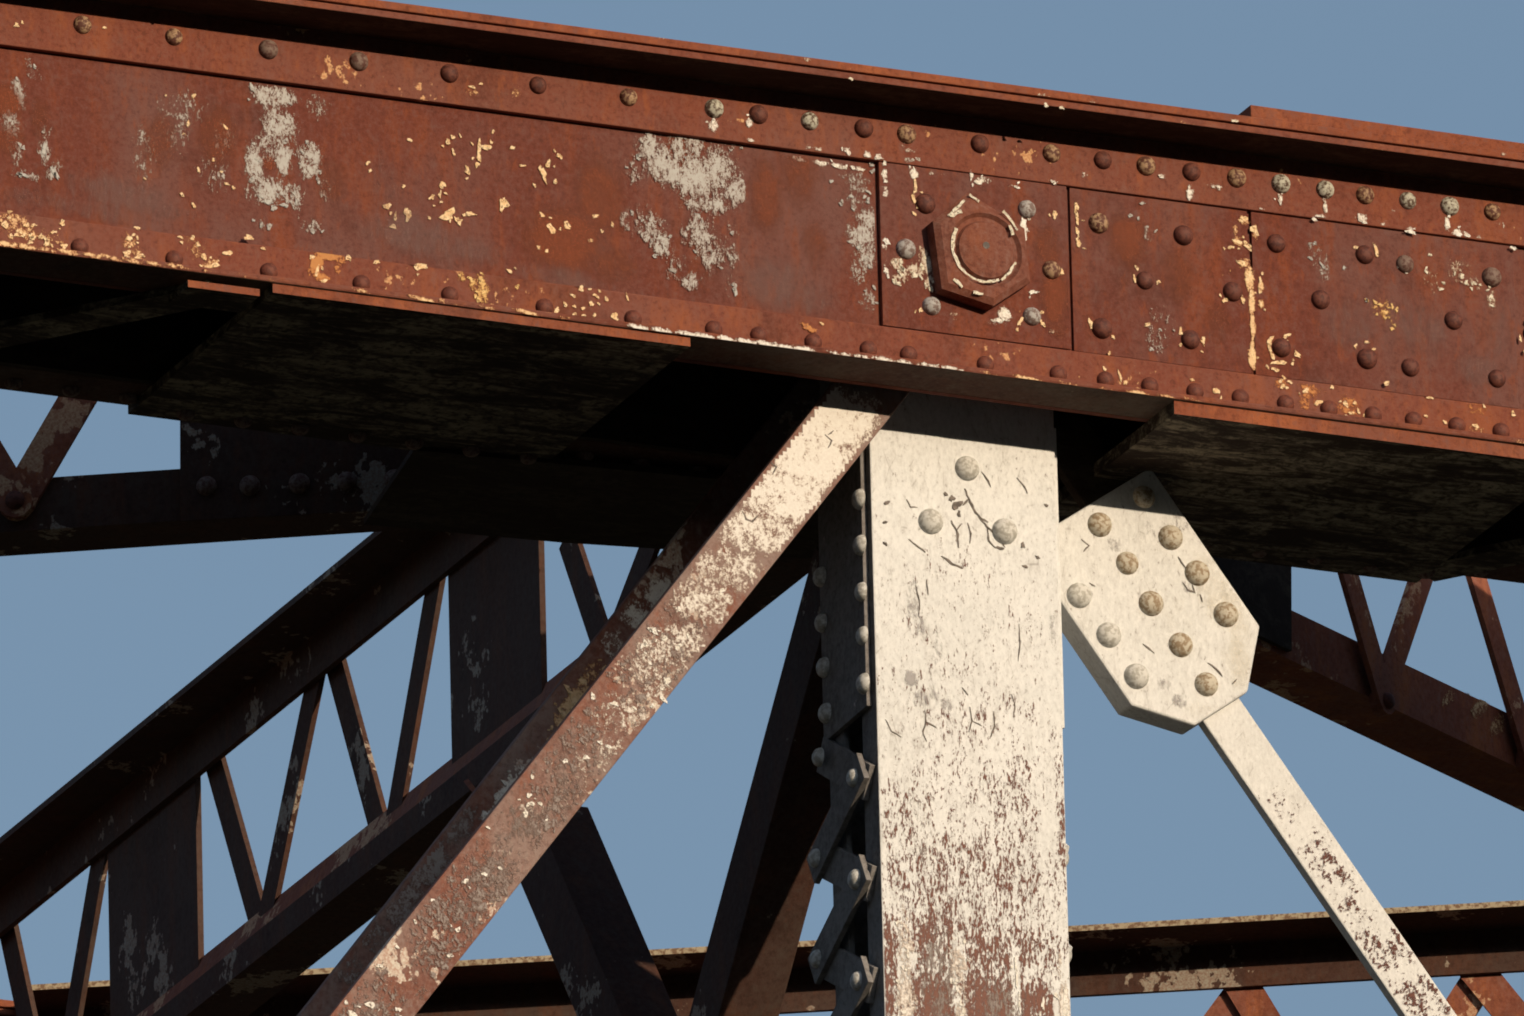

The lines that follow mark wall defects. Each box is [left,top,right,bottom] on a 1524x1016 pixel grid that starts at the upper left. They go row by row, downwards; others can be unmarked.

rust [0,86,21,150]
peeling [0,58,63,181]
peeling [0,83,332,272]
rust [308,252,351,283]
rust [530,166,630,271]
peeling [588,114,754,296]
peeling [512,285,990,374]
peeling [1219,193,1300,372]
rust [1275,375,1365,417]
peeling [334,383,883,1016]
rust [877,537,1068,1016]
rust [1259,789,1451,1016]